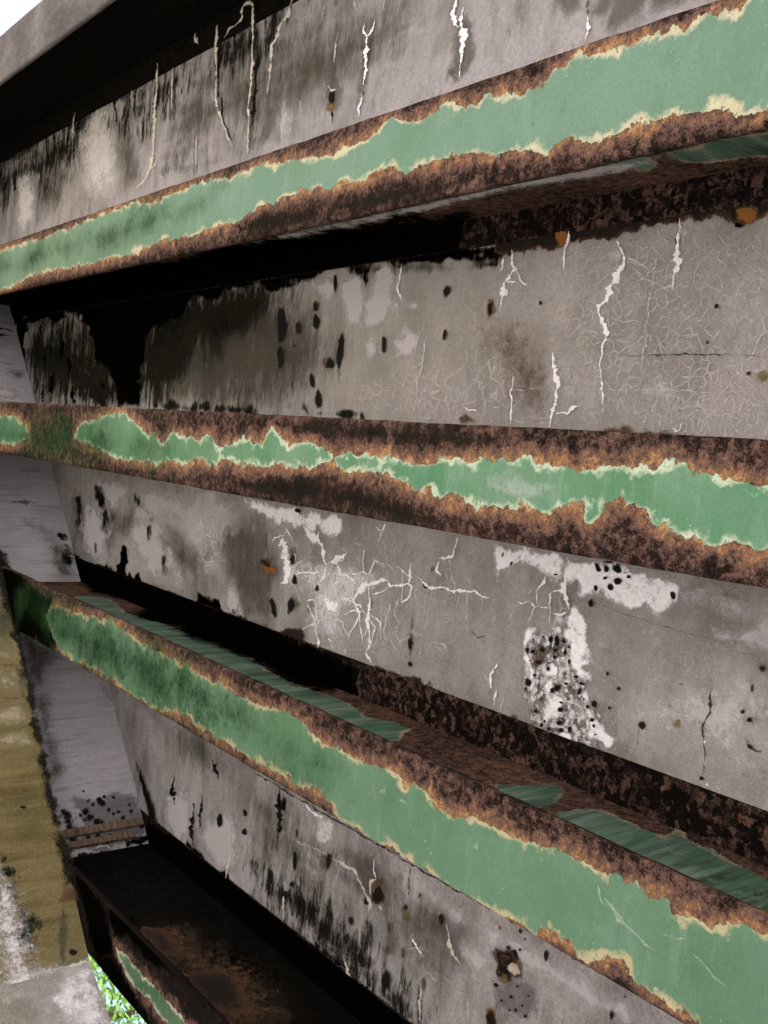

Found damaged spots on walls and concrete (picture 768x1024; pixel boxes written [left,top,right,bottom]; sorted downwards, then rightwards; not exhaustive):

crack [213,0,292,155]
damp [0,165,513,454]
peeling [0,0,768,290]
crack [344,218,768,440]
rust [494,202,768,255]
damp [53,472,446,696]
rust [289,548,297,585]
crack [273,524,490,664]
peeling [74,411,768,551]
damp [136,762,464,1024]
peeling [45,596,768,1024]
rust [485,1008,496,1024]